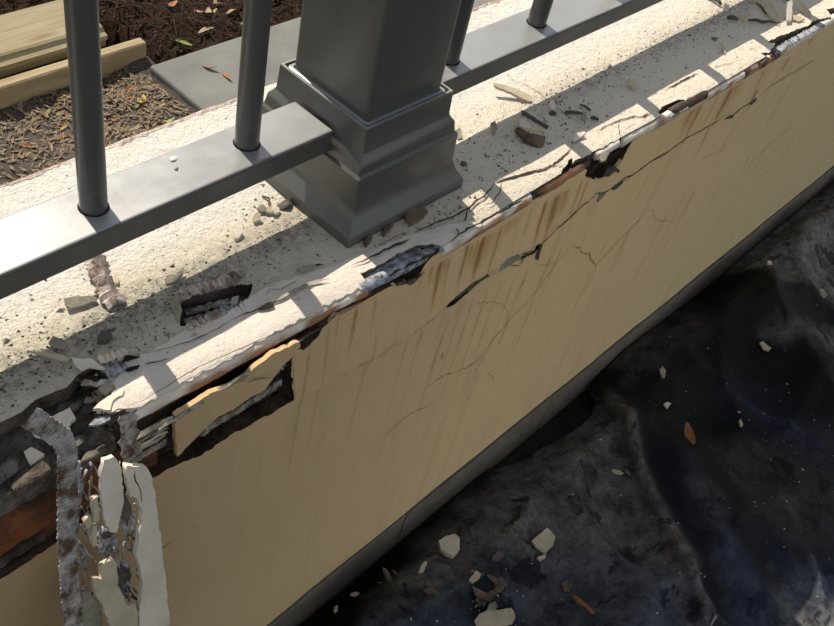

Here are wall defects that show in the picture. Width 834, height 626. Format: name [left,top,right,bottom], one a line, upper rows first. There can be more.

spalling [743,15,825,79]
spalling [667,90,708,118]
spalling [531,140,623,199]
rust [465,217,503,262]
crack [353,61,812,436]
peeling [64,296,97,311]
spalling [165,268,249,331]
spalling [136,328,321,468]
spalling [27,329,140,547]
spalling [0,425,58,569]
peeling [438,534,460,559]
peeling [90,557,139,626]